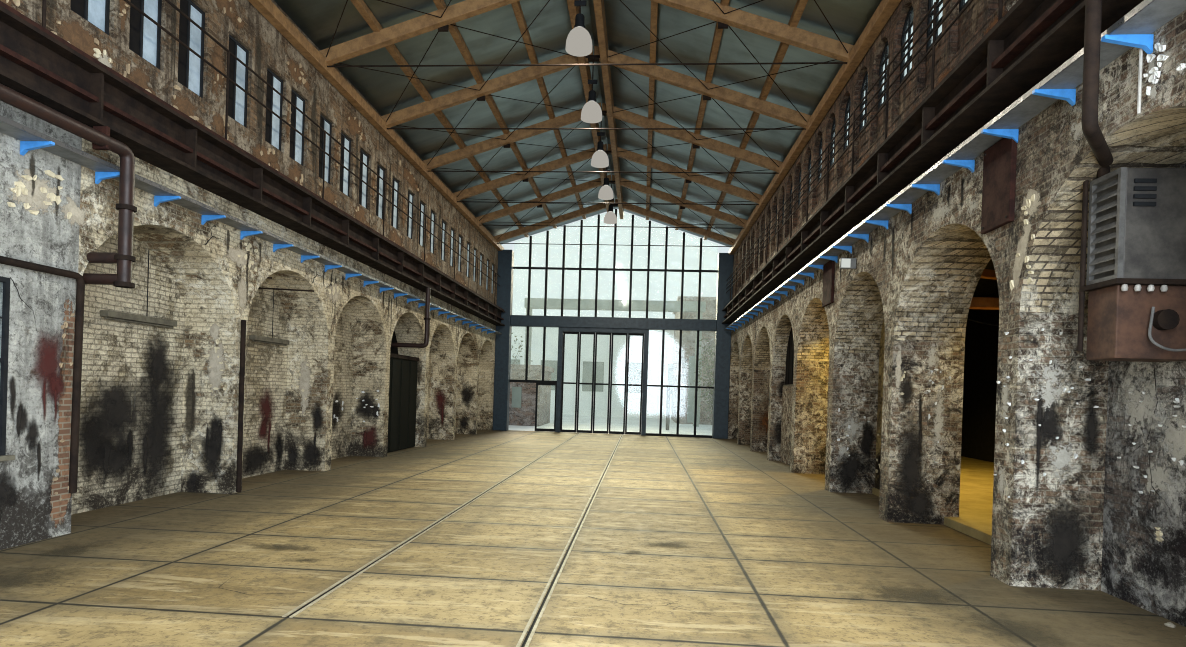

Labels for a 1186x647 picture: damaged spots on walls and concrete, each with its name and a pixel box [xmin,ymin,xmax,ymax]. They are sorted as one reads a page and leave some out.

leakage [0,474,17,520]
leakage [128,430,148,475]
leakage [1021,350,1091,490]
leakage [1119,375,1186,503]